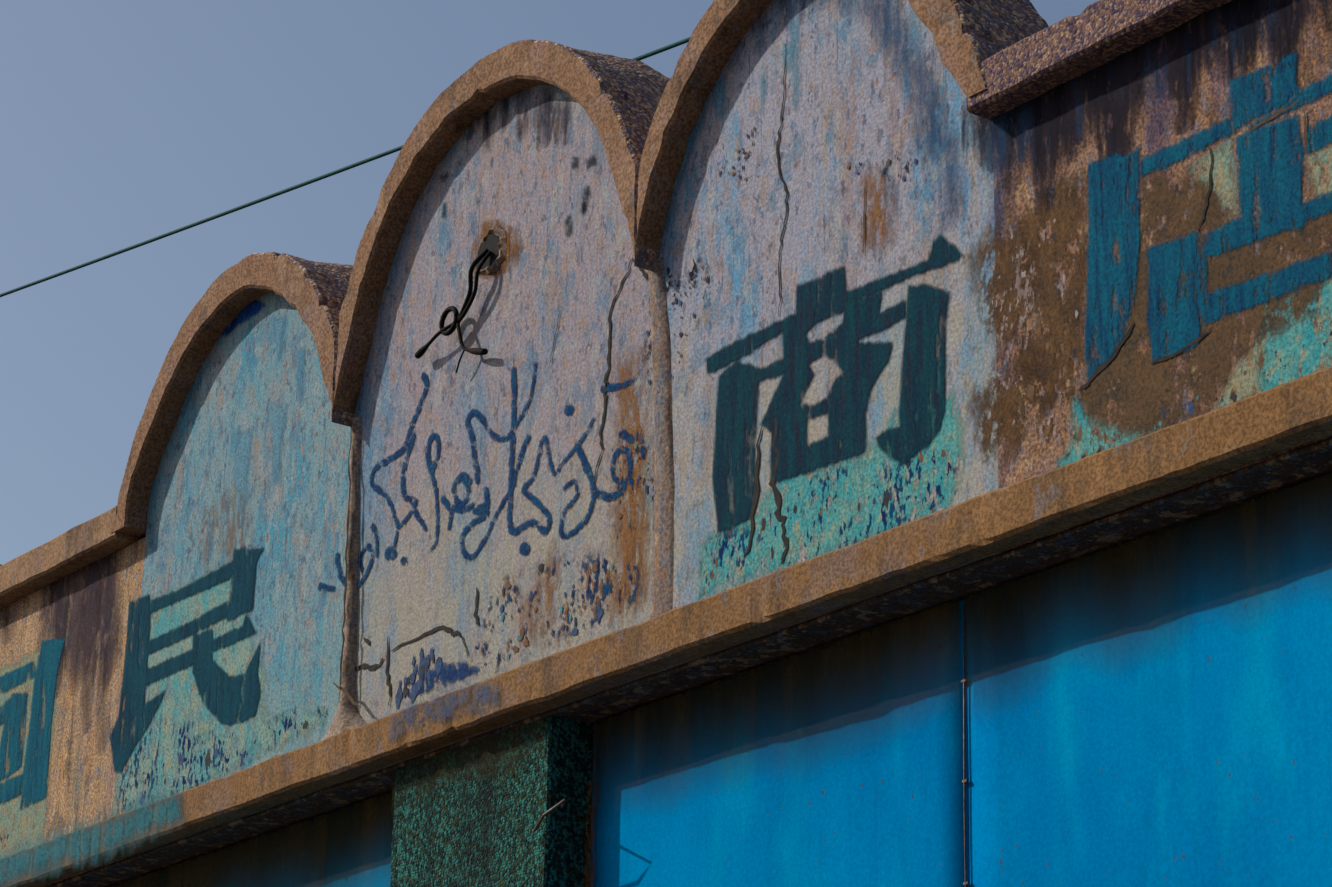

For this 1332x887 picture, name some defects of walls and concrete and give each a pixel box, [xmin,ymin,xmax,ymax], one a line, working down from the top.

peeling [717,127,755,182]
crack [776,46,788,316]
leakage [871,0,1332,208]
crack [1197,147,1213,233]
crack [1247,100,1307,155]
crack [594,258,648,482]
spalling [698,139,1332,597]
rust [611,353,648,606]
crack [744,418,788,564]